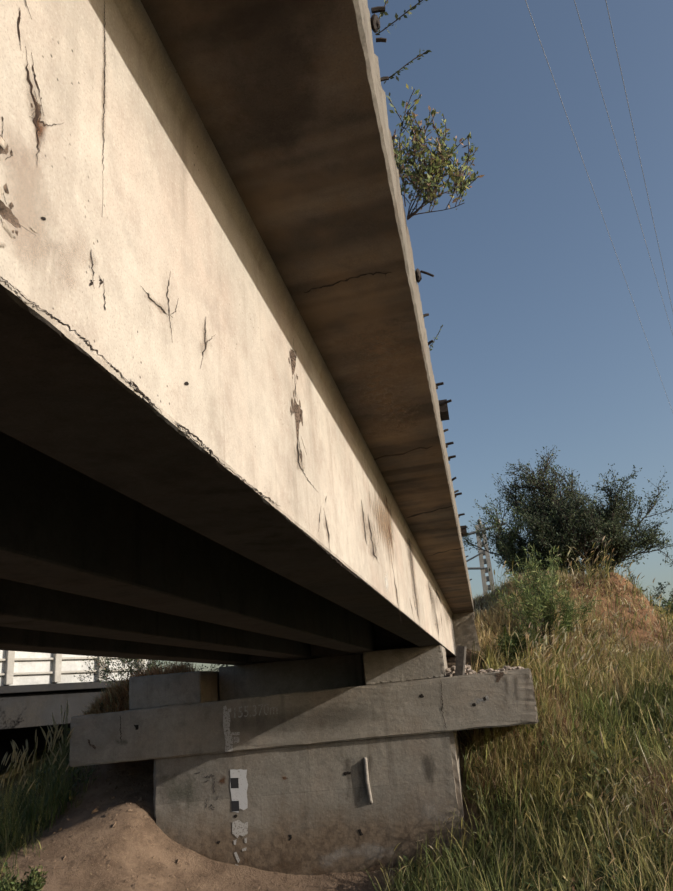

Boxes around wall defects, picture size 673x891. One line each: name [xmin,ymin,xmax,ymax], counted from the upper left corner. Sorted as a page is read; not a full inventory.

spalling [0,117,13,161]
spalling [0,183,37,248]
crack [18,0,63,162]
crack [90,255,106,310]
crack [100,0,108,173]
crack [1,271,280,506]